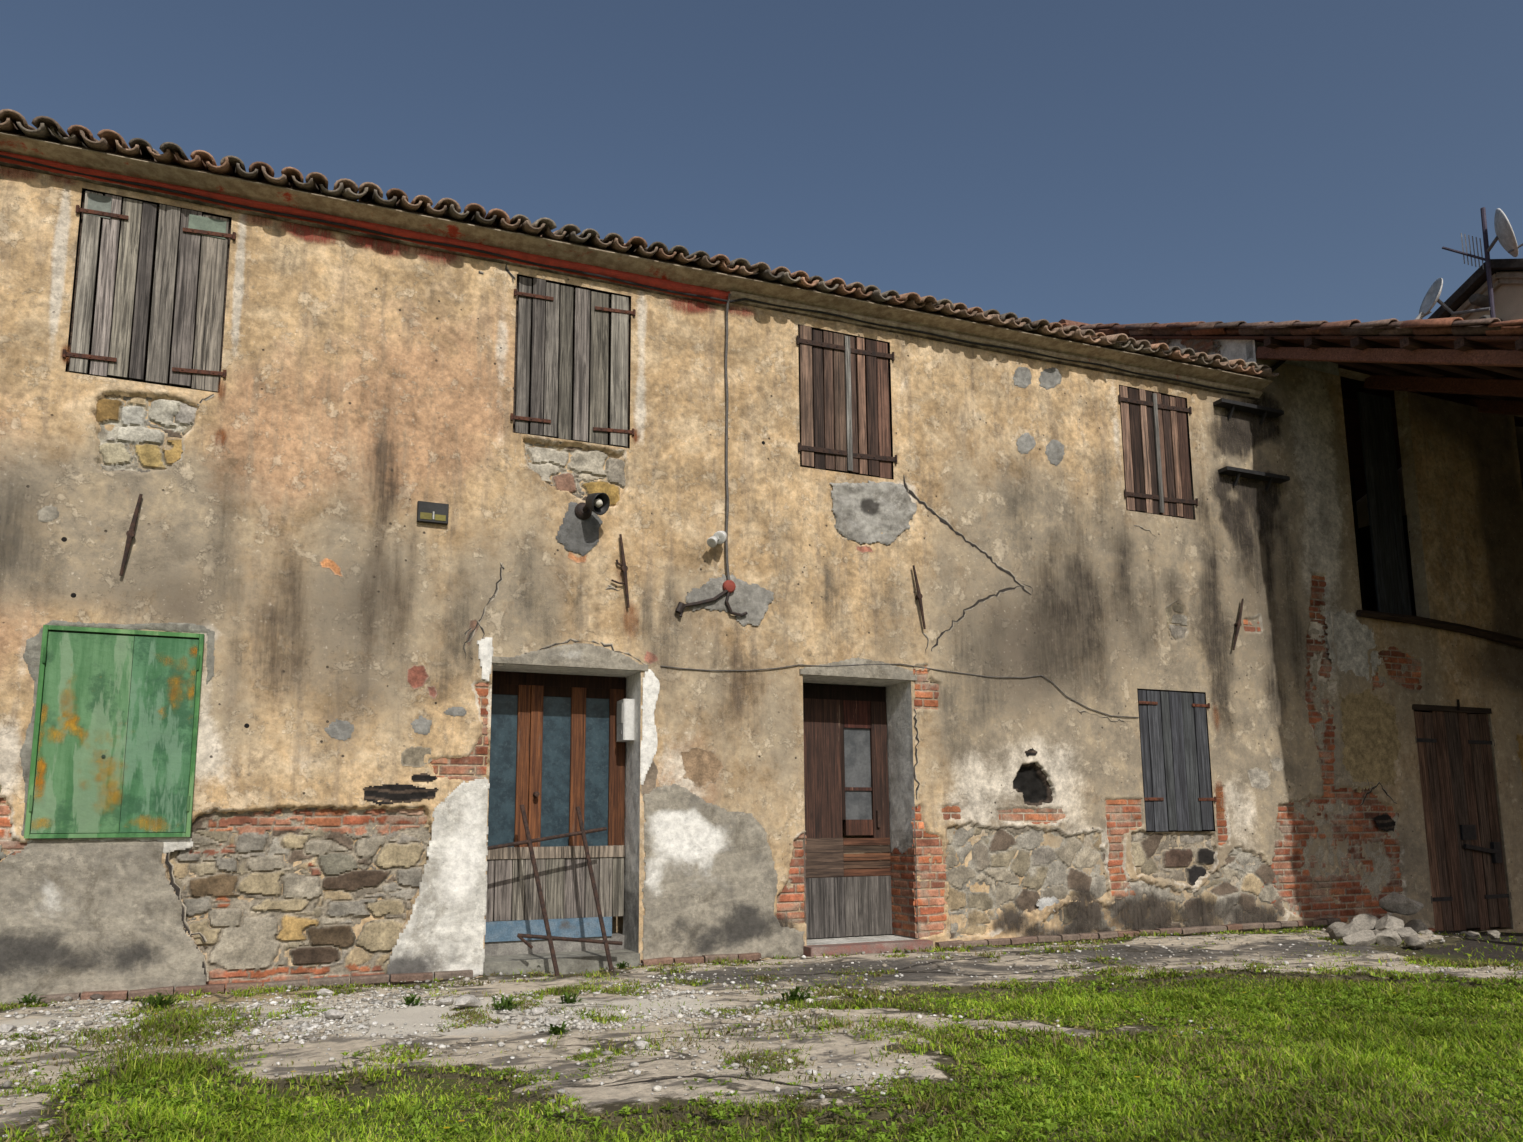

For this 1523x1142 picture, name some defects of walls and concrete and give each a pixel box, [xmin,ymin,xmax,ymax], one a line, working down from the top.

flaking render [407,665,438,699]
crack [463,562,505,658]
crack [903,475,1033,652]
damp [1202,549,1231,721]
flaking render [0,797,27,855]
flaking render [168,682,489,991]
flaking render [776,831,807,924]
flaking render [888,805,961,938]
spalling [997,748,1066,824]
flaking render [1036,896,1060,912]
flaking render [1105,799,1142,899]
flaking render [1262,575,1422,924]